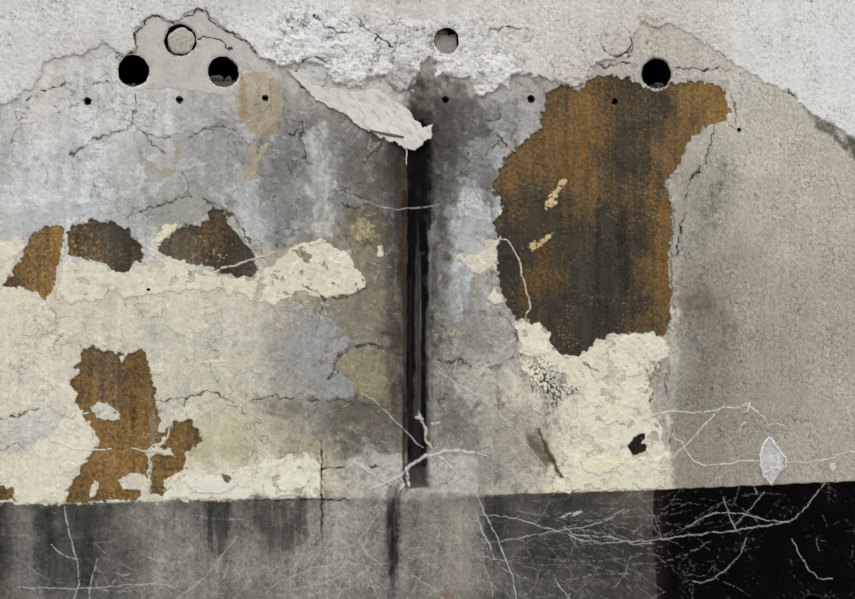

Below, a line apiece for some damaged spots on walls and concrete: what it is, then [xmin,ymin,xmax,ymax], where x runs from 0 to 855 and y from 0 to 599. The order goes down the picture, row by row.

spalling [116,8,273,97]
crack [69,94,234,157]
rust [3,218,143,300]
crack [127,172,251,243]
rust [158,207,258,278]
peeling [55,238,366,305]
leakage [402,121,457,488]
rust [492,74,732,357]
peeling [1,404,97,506]
rust [66,345,202,504]
crack [160,390,233,407]
peeling [515,321,670,494]